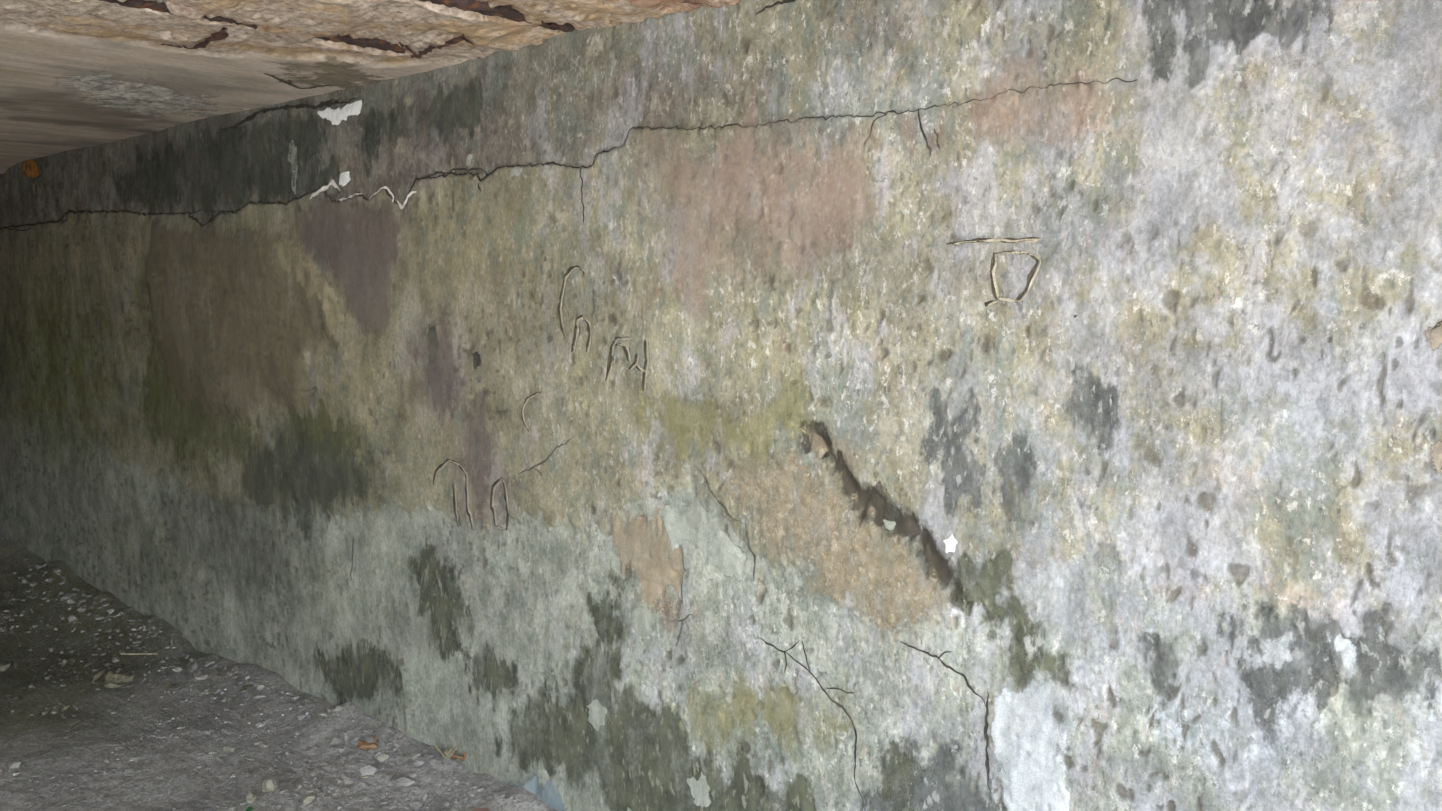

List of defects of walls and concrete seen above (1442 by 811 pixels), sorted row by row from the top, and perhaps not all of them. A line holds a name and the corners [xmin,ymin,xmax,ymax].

spalling [99,0,175,15]
spalling [201,15,257,29]
spalling [316,34,406,54]
spalling [419,0,575,32]
crack [0,73,1137,231]
damp [586,502,683,644]
damp [409,541,518,712]
mould [950,549,1071,694]
mould [860,738,1007,811]